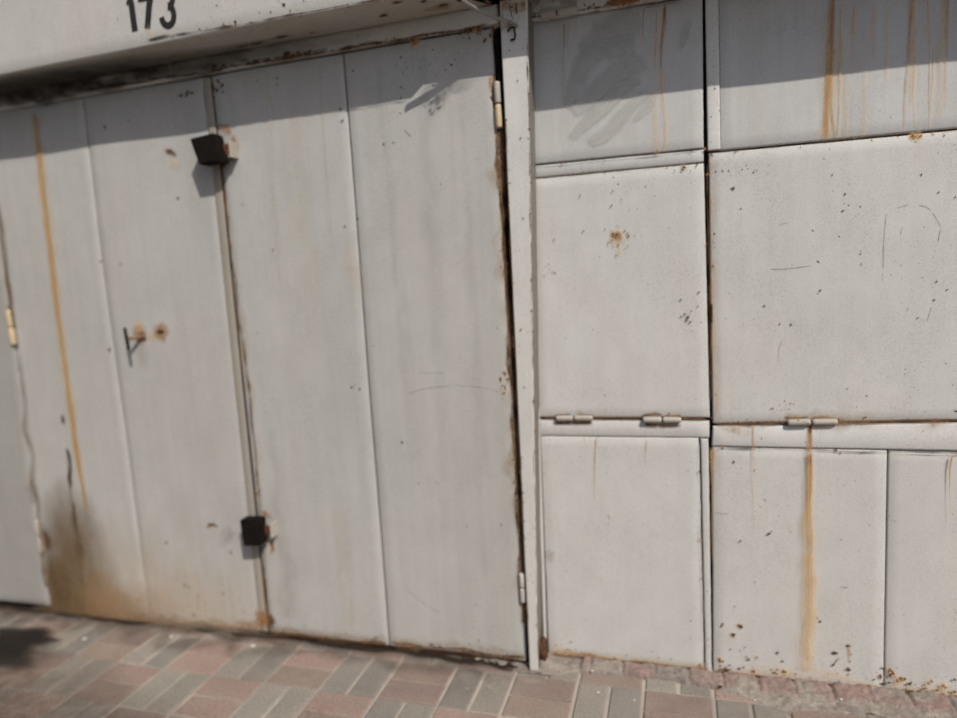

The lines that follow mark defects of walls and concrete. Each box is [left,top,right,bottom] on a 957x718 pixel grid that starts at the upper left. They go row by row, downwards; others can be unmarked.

corrosion [800,0,954,148]
corrosion [220,158,234,251]
corrosion [528,128,739,245]
corrosion [33,114,87,506]
corrosion [493,119,536,582]
water stain [0,513,517,668]
corrosion [239,542,523,659]
corrosion [548,412,956,655]